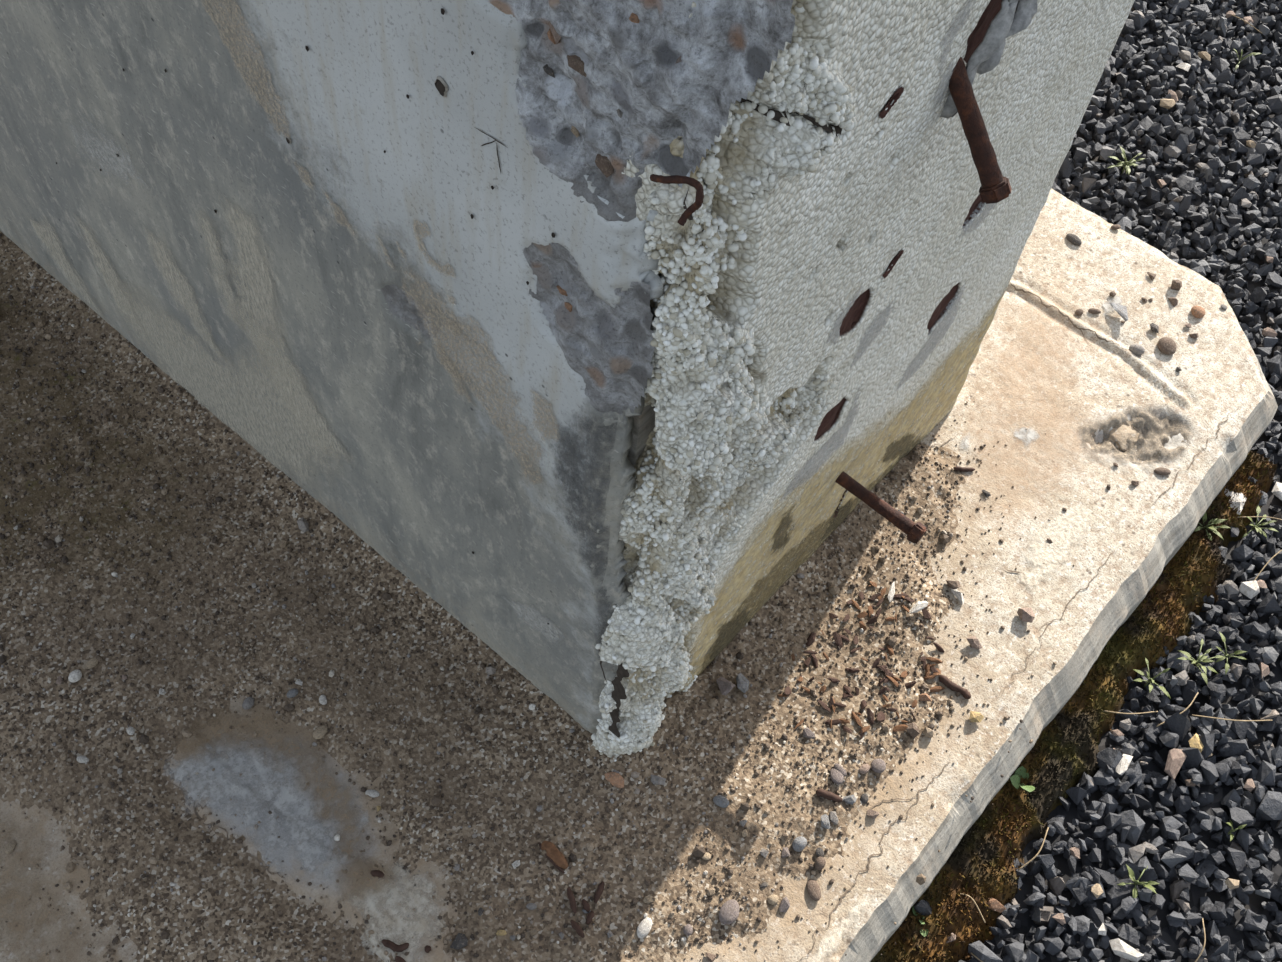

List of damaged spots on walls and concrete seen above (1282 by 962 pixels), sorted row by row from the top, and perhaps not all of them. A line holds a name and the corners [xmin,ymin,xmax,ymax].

spalling [486,0,795,222]
crack [736,98,842,137]
spalling [523,233,655,419]
crack [1010,282,1122,348]
damp [556,418,618,644]
damp [670,296,1003,695]
crack [598,649,629,738]